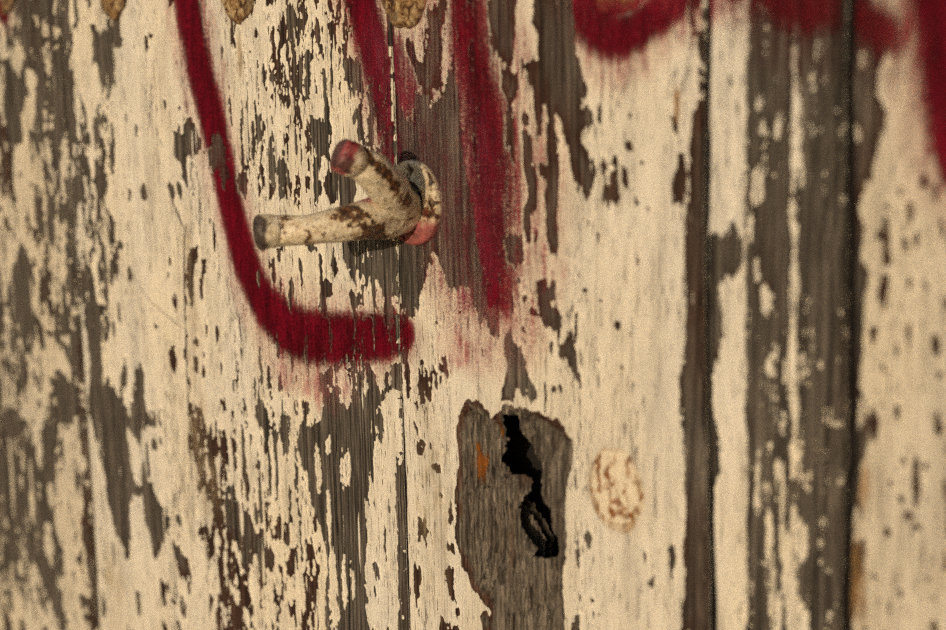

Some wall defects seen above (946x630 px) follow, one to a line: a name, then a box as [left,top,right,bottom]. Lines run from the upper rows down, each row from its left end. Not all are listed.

peeling [0,0,651,630]
peeling [642,0,946,630]